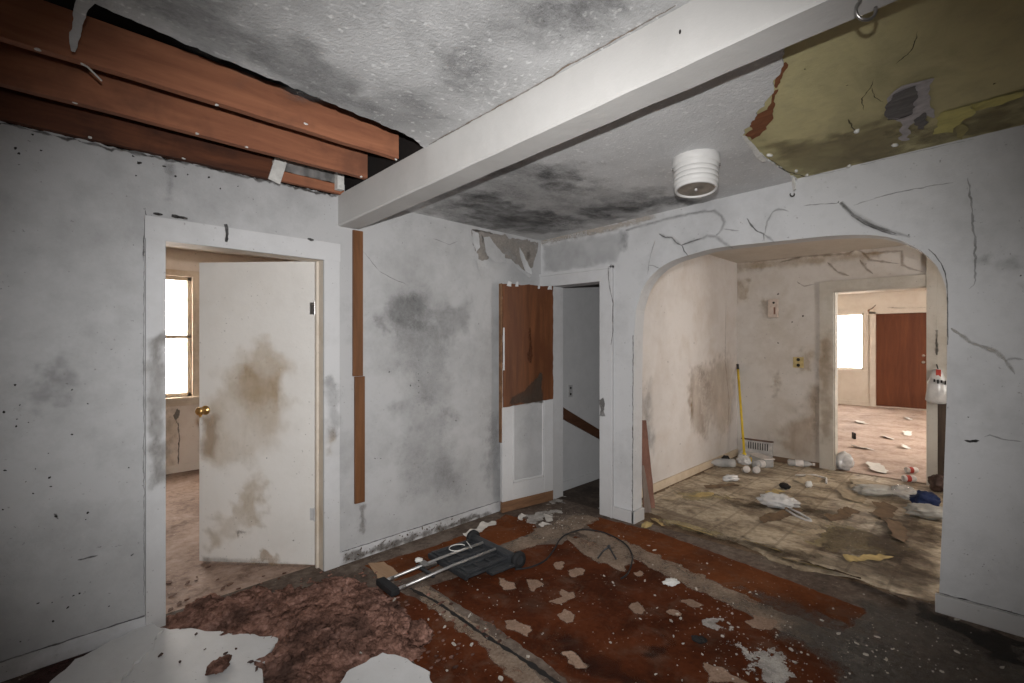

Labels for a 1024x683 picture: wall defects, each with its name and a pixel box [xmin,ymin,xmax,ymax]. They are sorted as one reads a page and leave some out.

flaking render [884,78,1024,141]
peeling [471,229,552,290]
crack [826,202,898,276]
crack [931,251,1011,368]